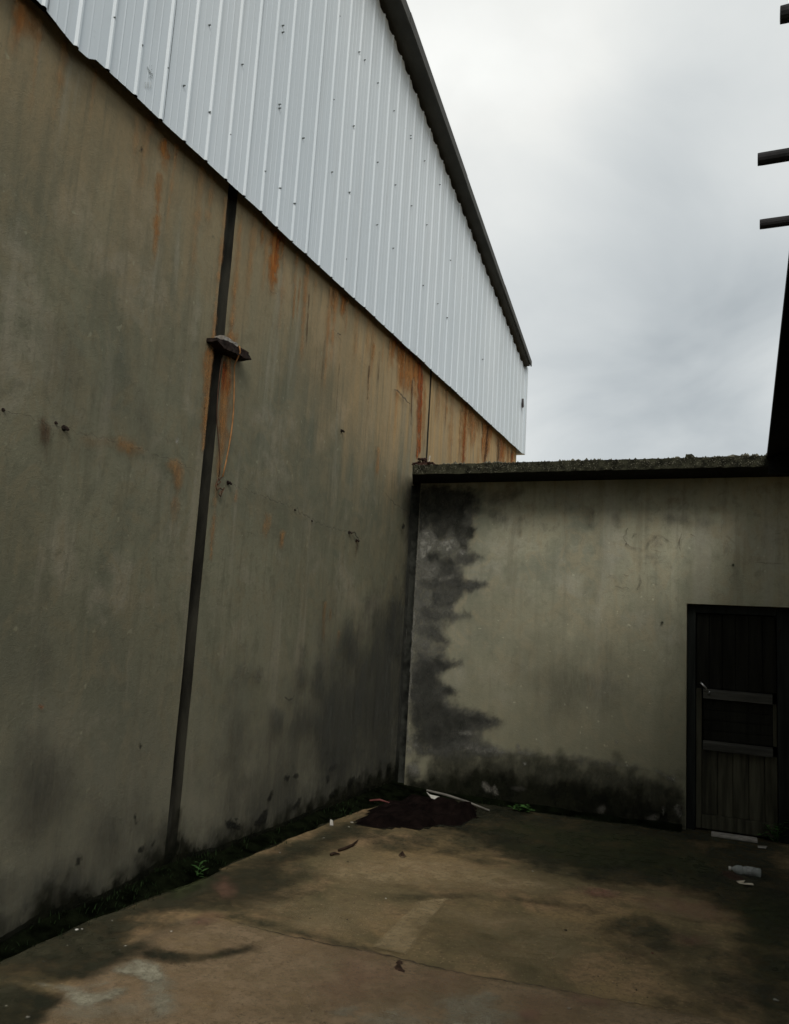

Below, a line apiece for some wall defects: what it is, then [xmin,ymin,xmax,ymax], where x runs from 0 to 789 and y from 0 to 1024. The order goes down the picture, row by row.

rust [261,217,286,283]
rust [202,315,231,474]
rust [390,337,426,457]
rust [450,406,514,463]
water stain [408,485,505,776]
water stain [0,800,789,1024]